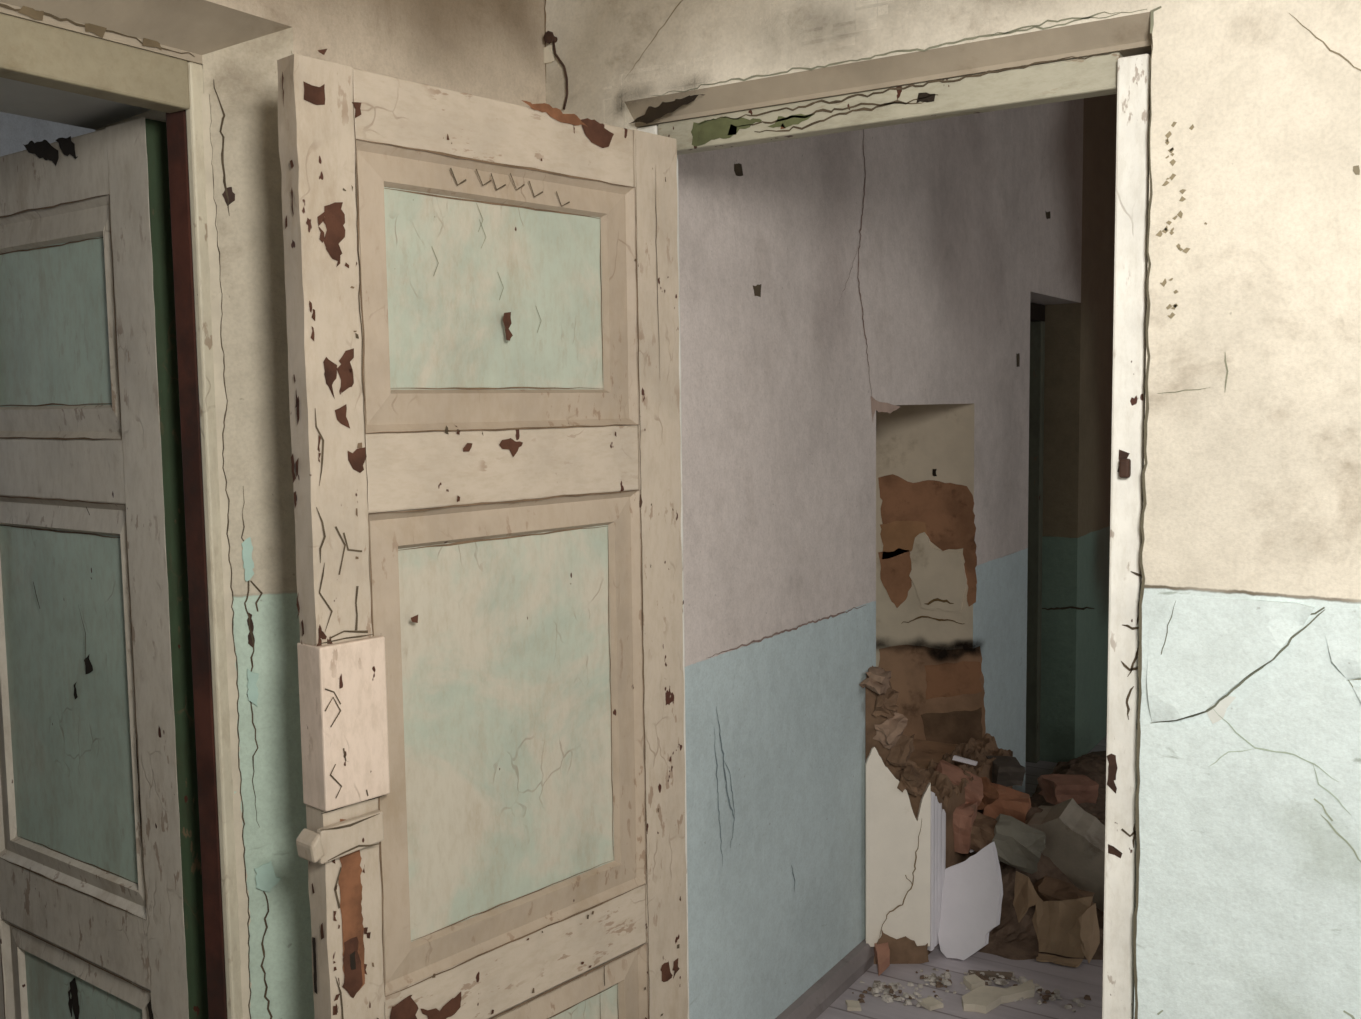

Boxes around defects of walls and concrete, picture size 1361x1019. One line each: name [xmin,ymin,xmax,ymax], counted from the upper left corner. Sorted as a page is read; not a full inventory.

flaking render [629,6,1162,124]
peeling [521,100,614,148]
peeling [691,114,814,146]
crack [701,53,1111,401]
crack [1121,33,1352,1019]
crack [901,598,965,624]
crack [1042,604,1094,612]
flaking render [878,645,986,745]
crack [878,821,922,941]
flaking render [874,931,929,964]